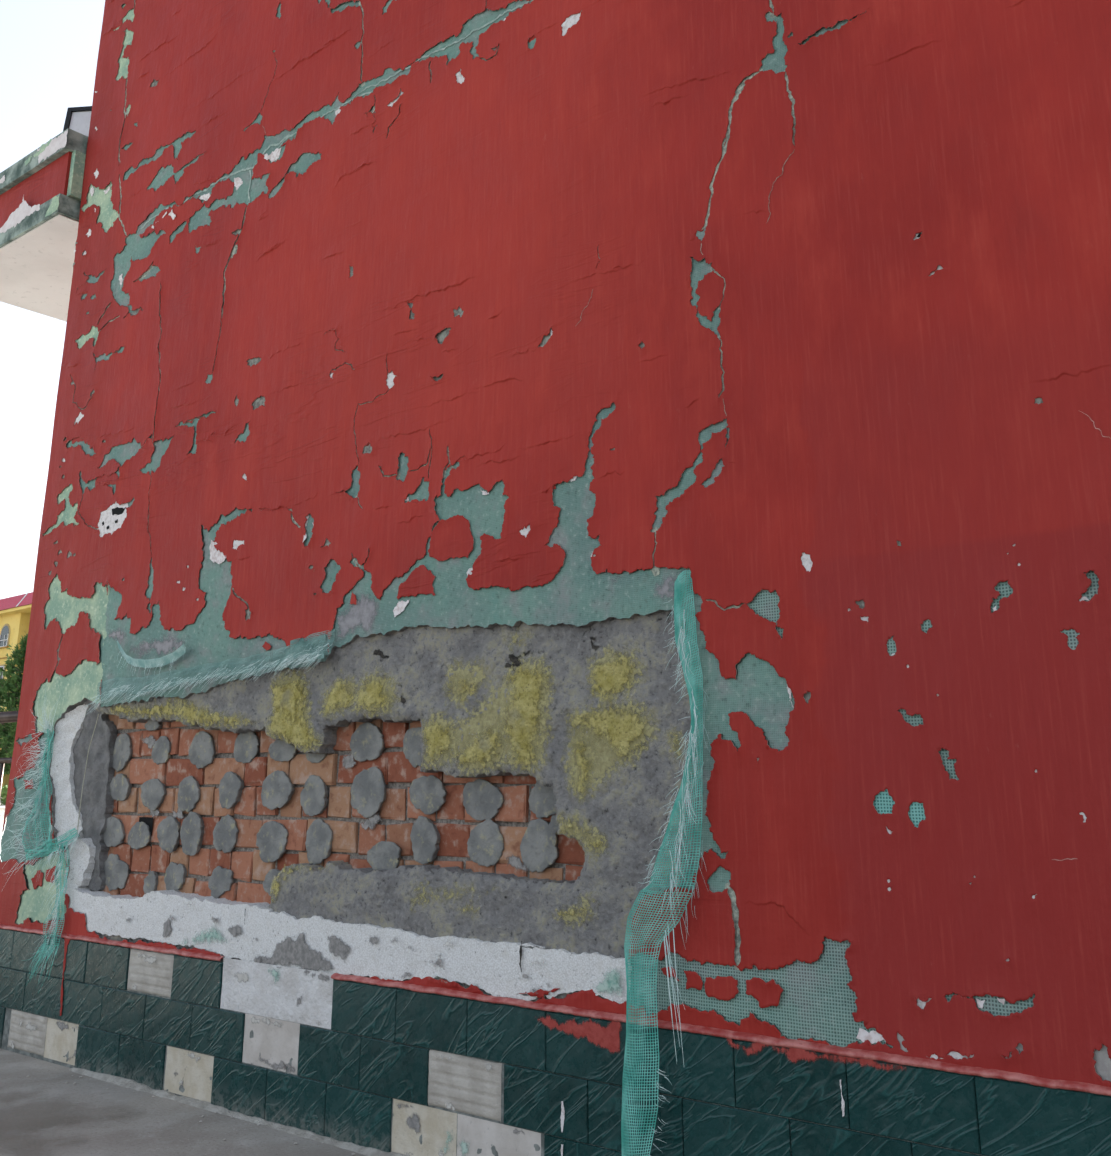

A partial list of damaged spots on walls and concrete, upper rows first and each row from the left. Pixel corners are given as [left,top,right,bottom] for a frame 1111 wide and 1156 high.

peeling [561,13,581,36]
peeling [0,195,59,233]
peeling [25,129,68,165]
peeling [73,0,533,349]
crack [690,0,857,397]
peeling [346,361,396,509]
peeling [991,581,1013,613]
peeling [0,400,908,1052]
peeling [125,939,333,1075]
peeling [7,1009,79,1066]
peeling [164,1046,214,1103]
peeling [1093,1044,1111,1081]